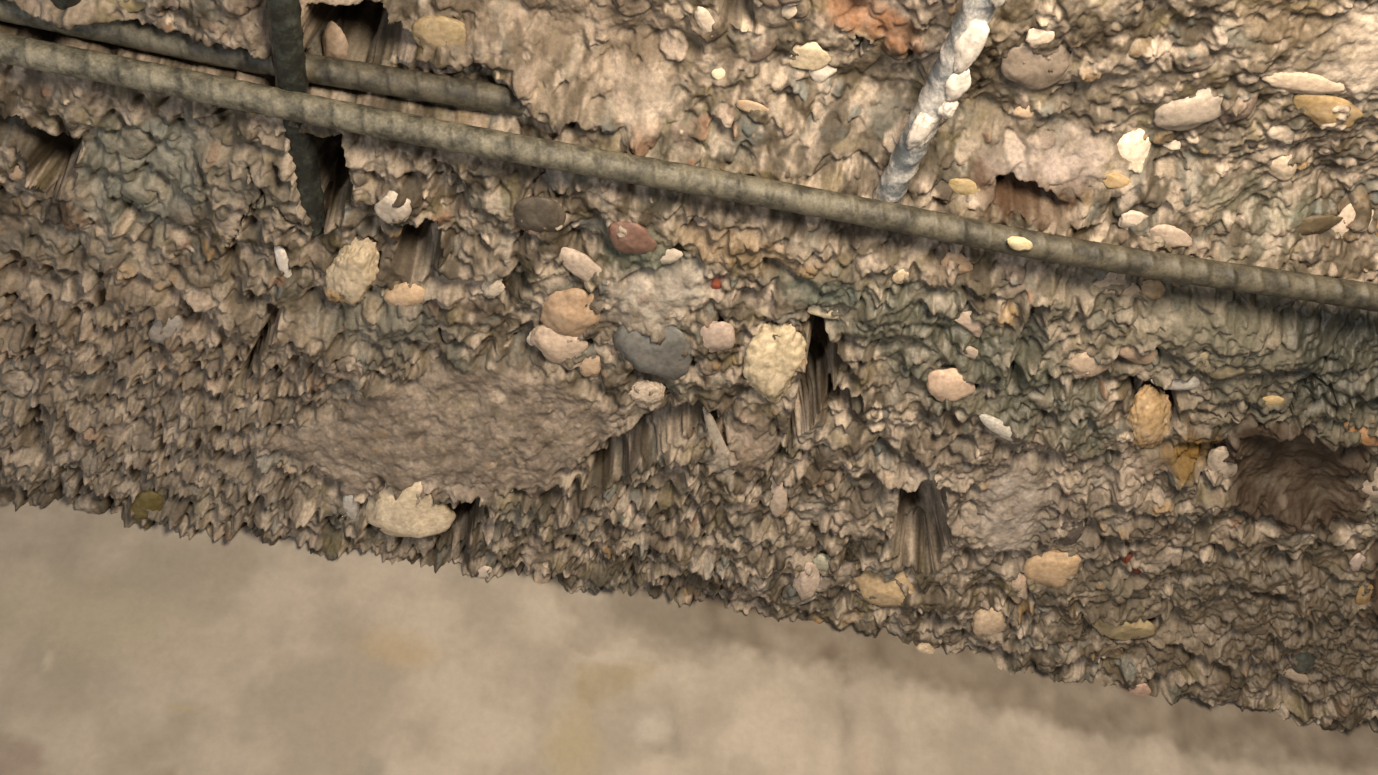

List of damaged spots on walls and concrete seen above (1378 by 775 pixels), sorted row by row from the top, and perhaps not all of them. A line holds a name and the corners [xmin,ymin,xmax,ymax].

spalling [0,0,1378,312]
spalling [229,304,284,395]
spalling [433,495,485,551]
spalling [587,400,705,490]
spalling [769,476,788,517]
spalling [784,314,843,454]
spalling [827,362,864,413]
spalling [890,478,955,576]
spalling [979,414,1013,441]
spalling [1143,381,1184,443]
spalling [1229,403,1378,531]
spalling [543,576,722,670]